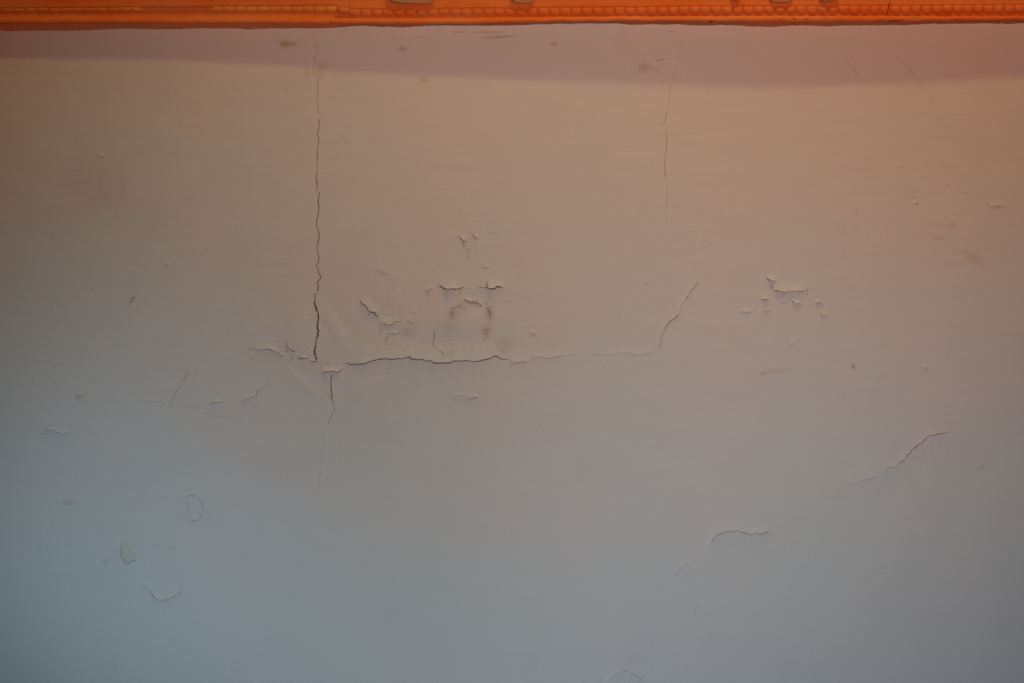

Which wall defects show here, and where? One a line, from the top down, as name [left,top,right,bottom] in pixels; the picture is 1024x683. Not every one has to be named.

crack [312,45,583,423]
peeling [354,295,401,333]
peeling [424,274,506,316]
crack [655,280,701,351]
peeling [738,273,829,319]
crack [826,424,955,502]
peeling [703,515,771,568]